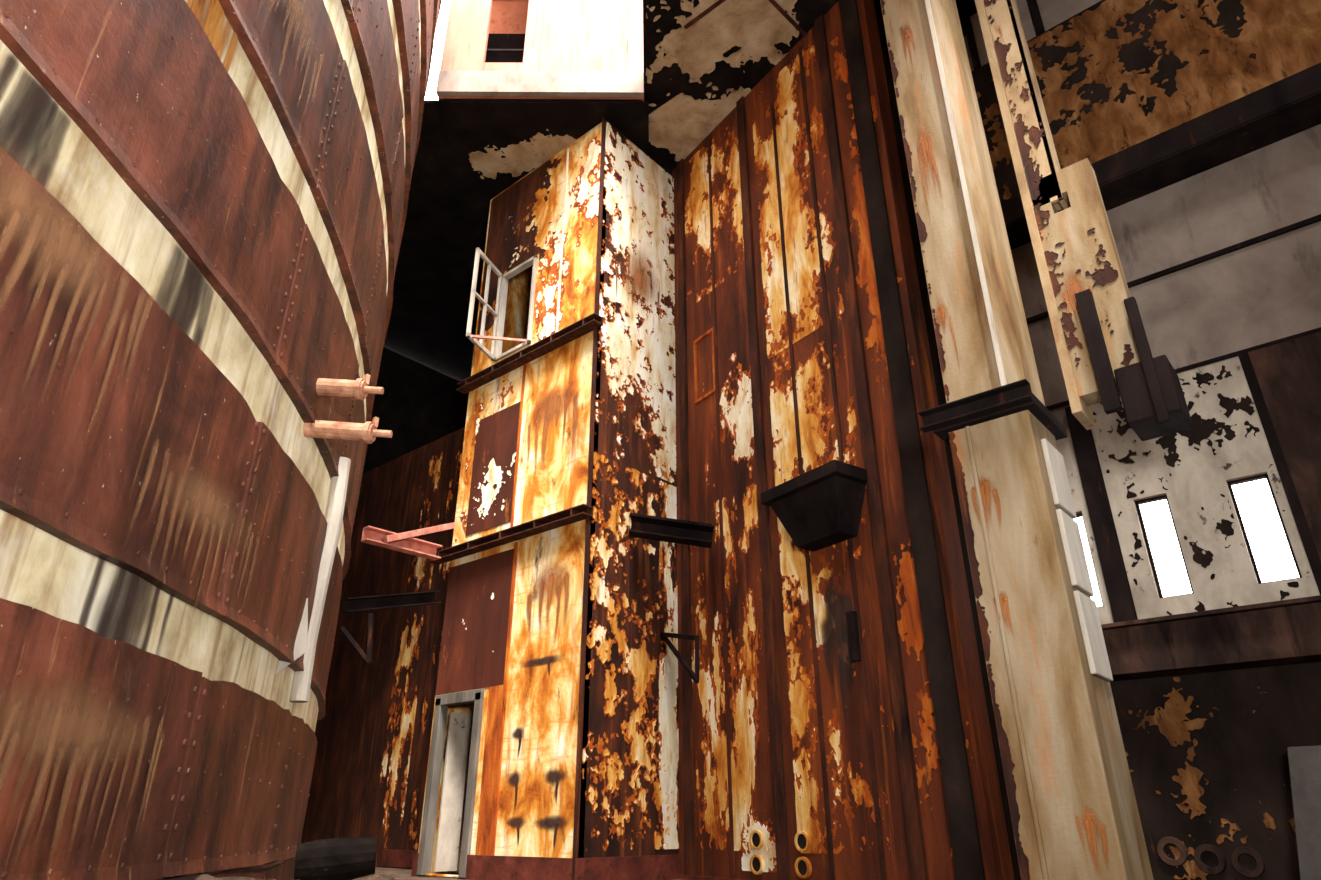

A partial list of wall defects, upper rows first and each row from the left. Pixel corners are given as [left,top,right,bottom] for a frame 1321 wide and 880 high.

corrosion [187,0,238,72]
peeling [976,0,1321,170]
corrosion [0,150,153,414]
peeling [1076,228,1119,293]
peeling [469,0,857,873]
peeling [1101,365,1260,490]
peeling [1184,494,1234,580]
corrosion [527,566,569,633]
corrosion [525,656,558,674]
peeling [777,517,890,854]
corrosion [513,728,523,754]
corrosion [508,770,565,847]